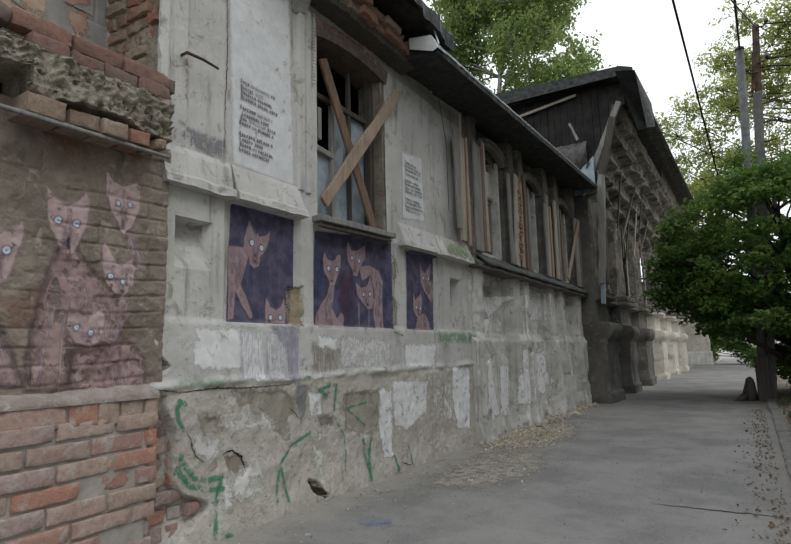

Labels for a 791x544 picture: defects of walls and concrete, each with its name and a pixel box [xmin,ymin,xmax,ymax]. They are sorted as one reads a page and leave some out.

flaking render [285,285,304,327]
flaking render [192,387,294,510]